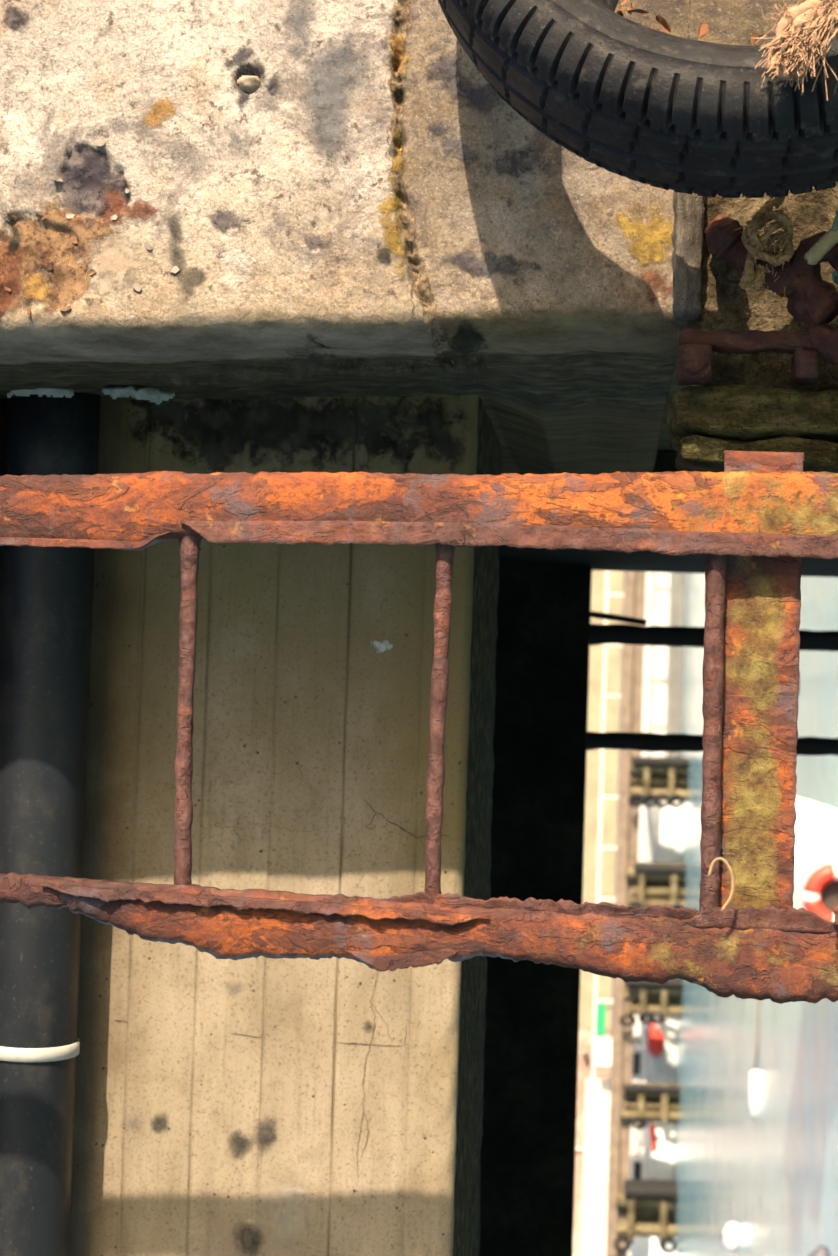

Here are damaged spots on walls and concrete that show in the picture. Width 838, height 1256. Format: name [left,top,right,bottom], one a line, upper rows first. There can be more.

rust [61,190,156,224]
crack [385,0,461,375]
rust [0,248,52,314]
leakage [130,322,487,473]
crack [338,972,407,1177]
leakage [152,1117,167,1131]
leakage [231,1123,276,1157]
leakage [237,1227,261,1256]